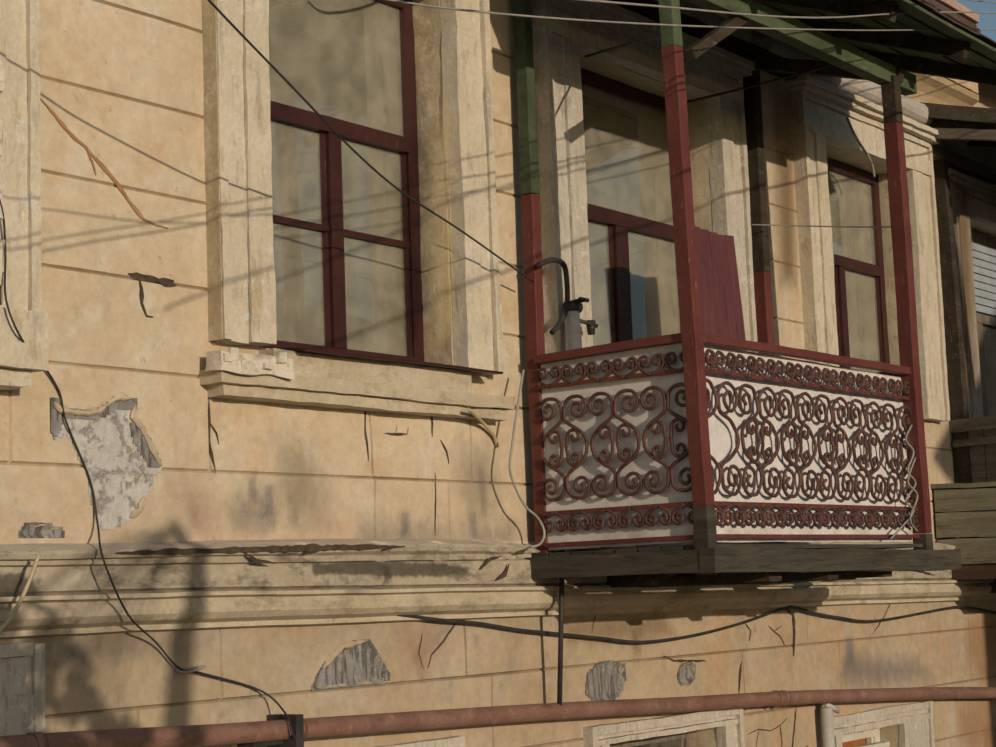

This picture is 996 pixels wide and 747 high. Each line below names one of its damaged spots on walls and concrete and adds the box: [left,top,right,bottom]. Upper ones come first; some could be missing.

crack [40,98,168,229]
crack [128,272,177,318]
crack [208,398,219,473]
peeling [50,392,162,530]
peeling [19,523,65,538]
water stain [0,574,37,597]
water stain [314,561,468,579]
peeling [312,639,391,691]
peeling [585,660,627,701]
peeling [677,662,696,686]
crack [748,708,808,747]